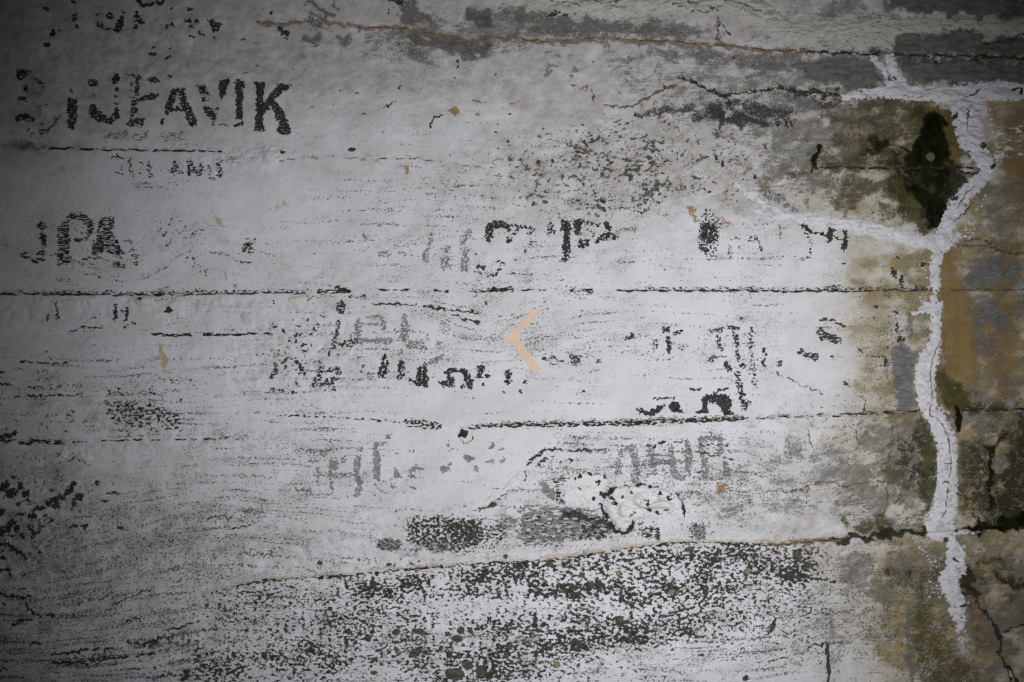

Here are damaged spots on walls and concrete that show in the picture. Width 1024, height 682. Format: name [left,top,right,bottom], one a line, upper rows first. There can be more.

peeling [763,172,860,218]
crack [811,163,1024,256]
peeling [439,429,506,473]
peeling [0,475,84,630]
spalling [191,476,852,682]